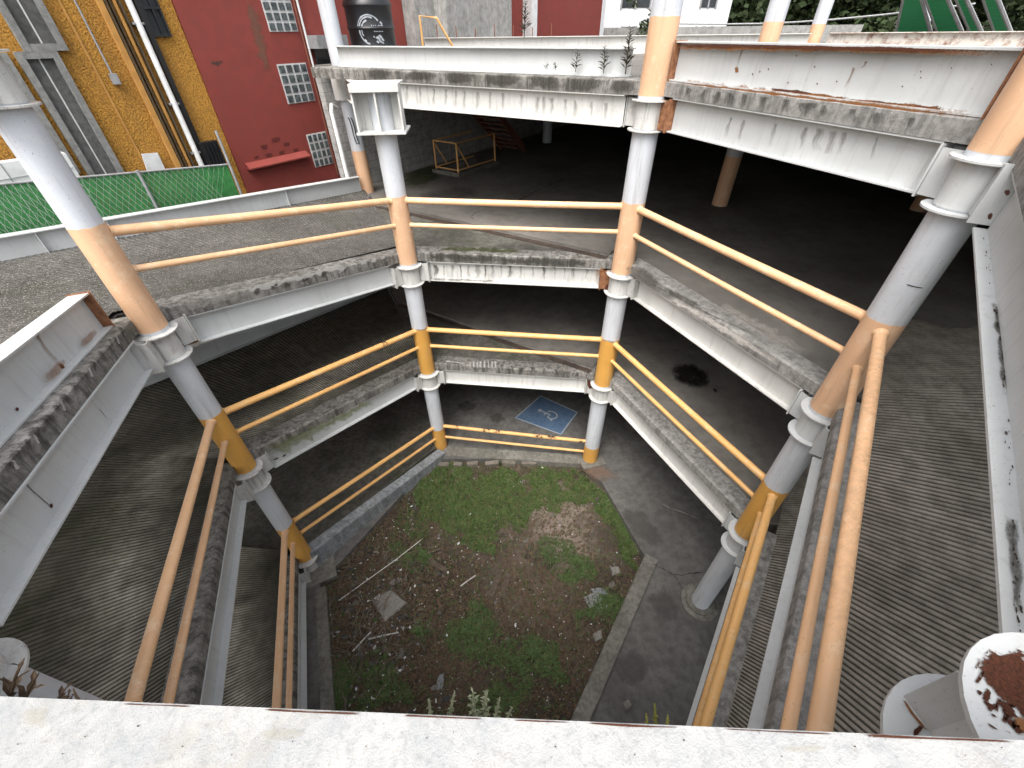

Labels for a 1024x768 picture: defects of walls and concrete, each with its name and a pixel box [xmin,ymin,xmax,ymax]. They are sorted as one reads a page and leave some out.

corrosion [678,44,983,69]
damp [369,68,388,79]
damp [406,70,431,80]
damp [447,72,469,95]
damp [487,73,518,95]
damp [533,75,557,101]
damp [571,77,596,91]
damp [612,80,633,91]
corrosion [681,68,956,115]
corrosion [865,649,1024,742]